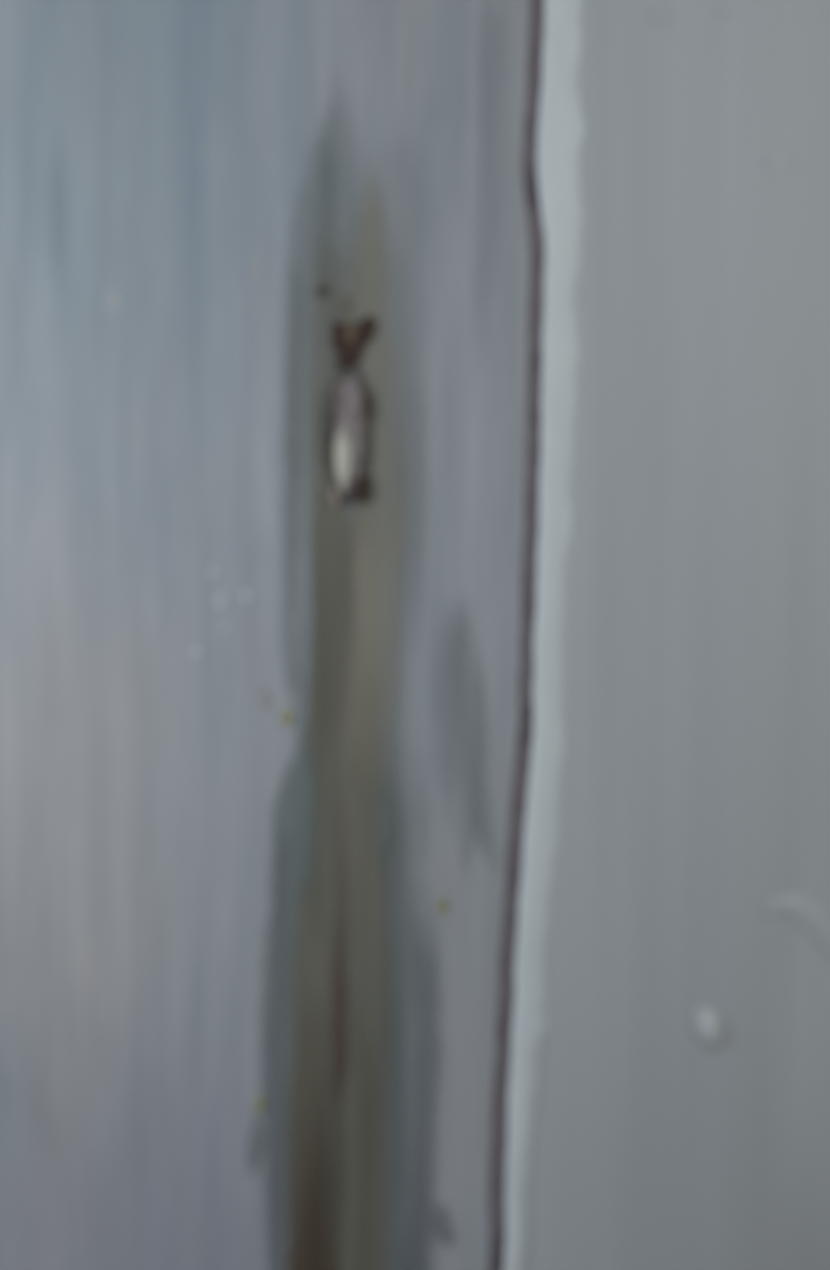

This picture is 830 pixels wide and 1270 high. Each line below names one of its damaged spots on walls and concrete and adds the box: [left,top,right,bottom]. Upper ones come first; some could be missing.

rust [288,434,395,1270]